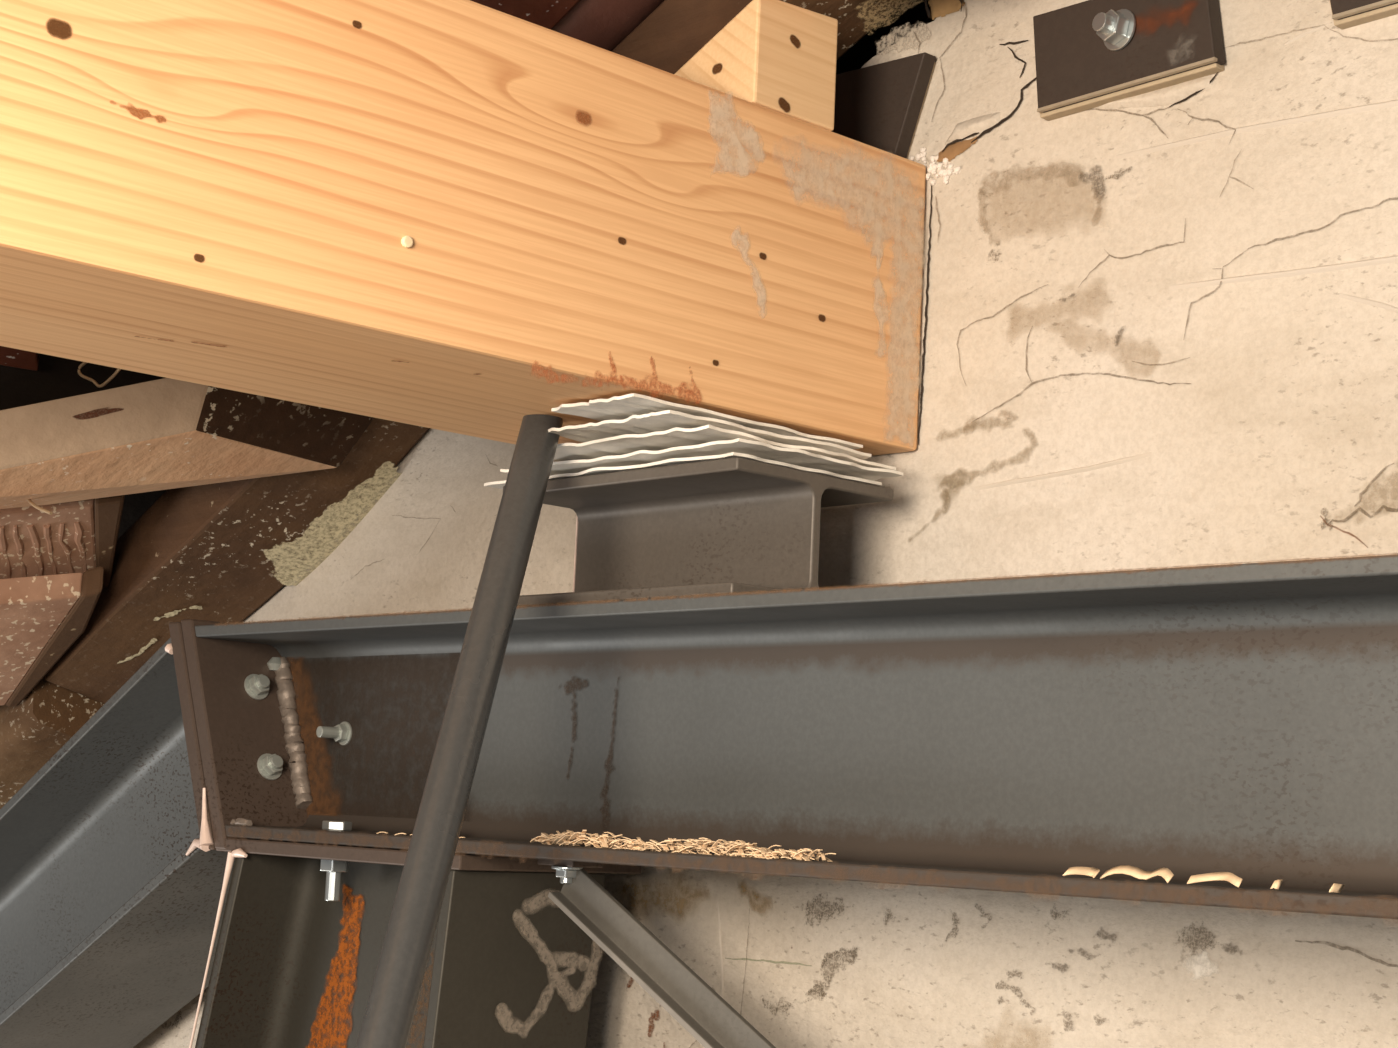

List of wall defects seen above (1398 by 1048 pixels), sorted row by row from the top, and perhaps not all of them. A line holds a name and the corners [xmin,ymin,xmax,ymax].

crack [971,40,1036,143]
crack [1098,72,1236,135]
crack [1085,233,1185,279]
crack [918,185,1048,445]
flaking render [1321,468,1398,530]
rust [289,658,339,816]
rust [306,885,364,1048]